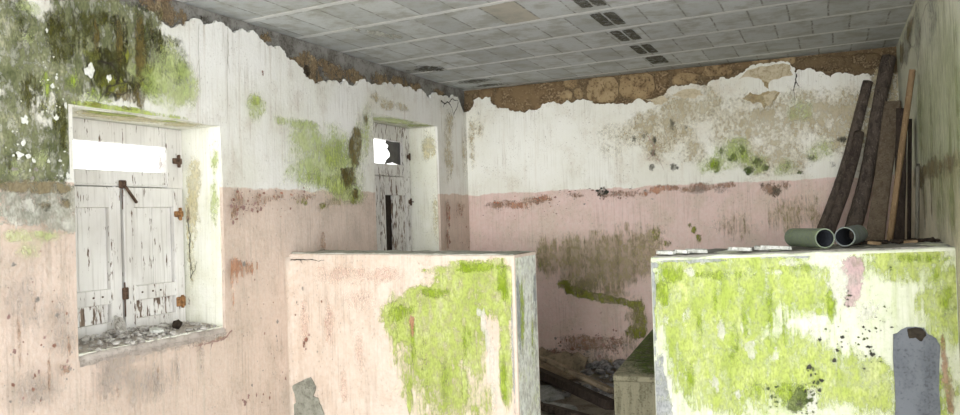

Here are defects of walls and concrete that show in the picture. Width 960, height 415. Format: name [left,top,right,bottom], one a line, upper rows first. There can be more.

flaking render [120,0,936,113]
damp [621,90,721,171]
damp [715,68,879,173]
peeling [483,187,653,220]
damp [477,309,494,372]
damp [511,225,727,415]
damp [818,317,882,374]
damp [407,346,428,413]
damp [766,364,824,415]